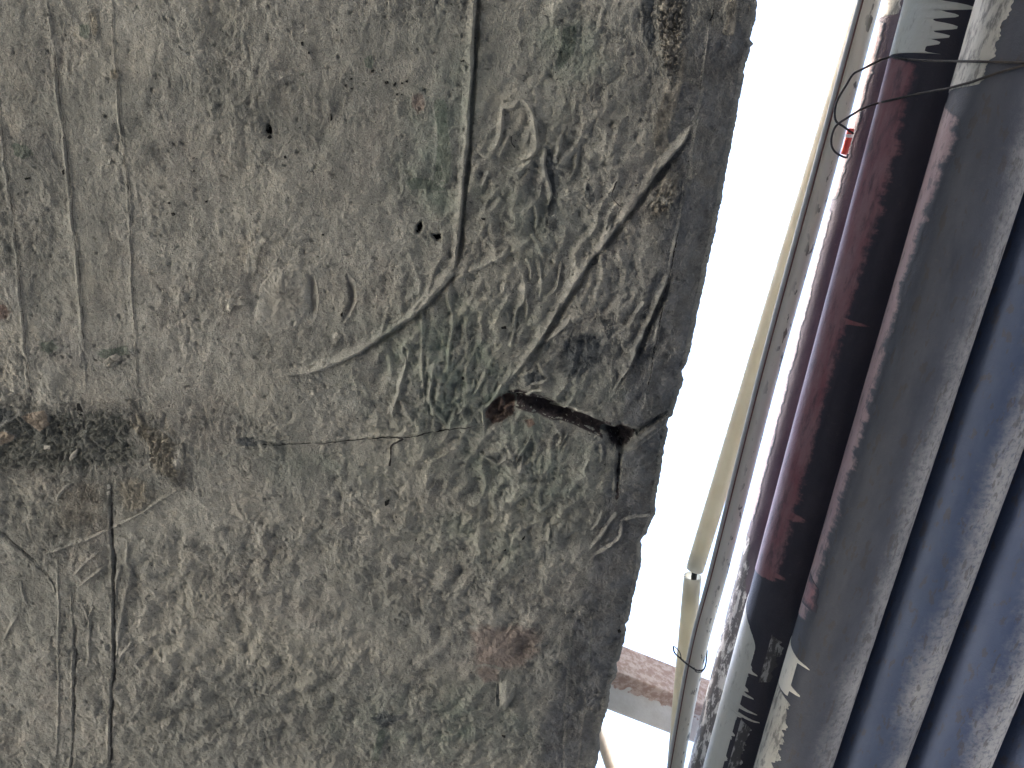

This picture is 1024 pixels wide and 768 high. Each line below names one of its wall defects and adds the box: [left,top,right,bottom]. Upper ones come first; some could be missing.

crack [227,421,486,468]